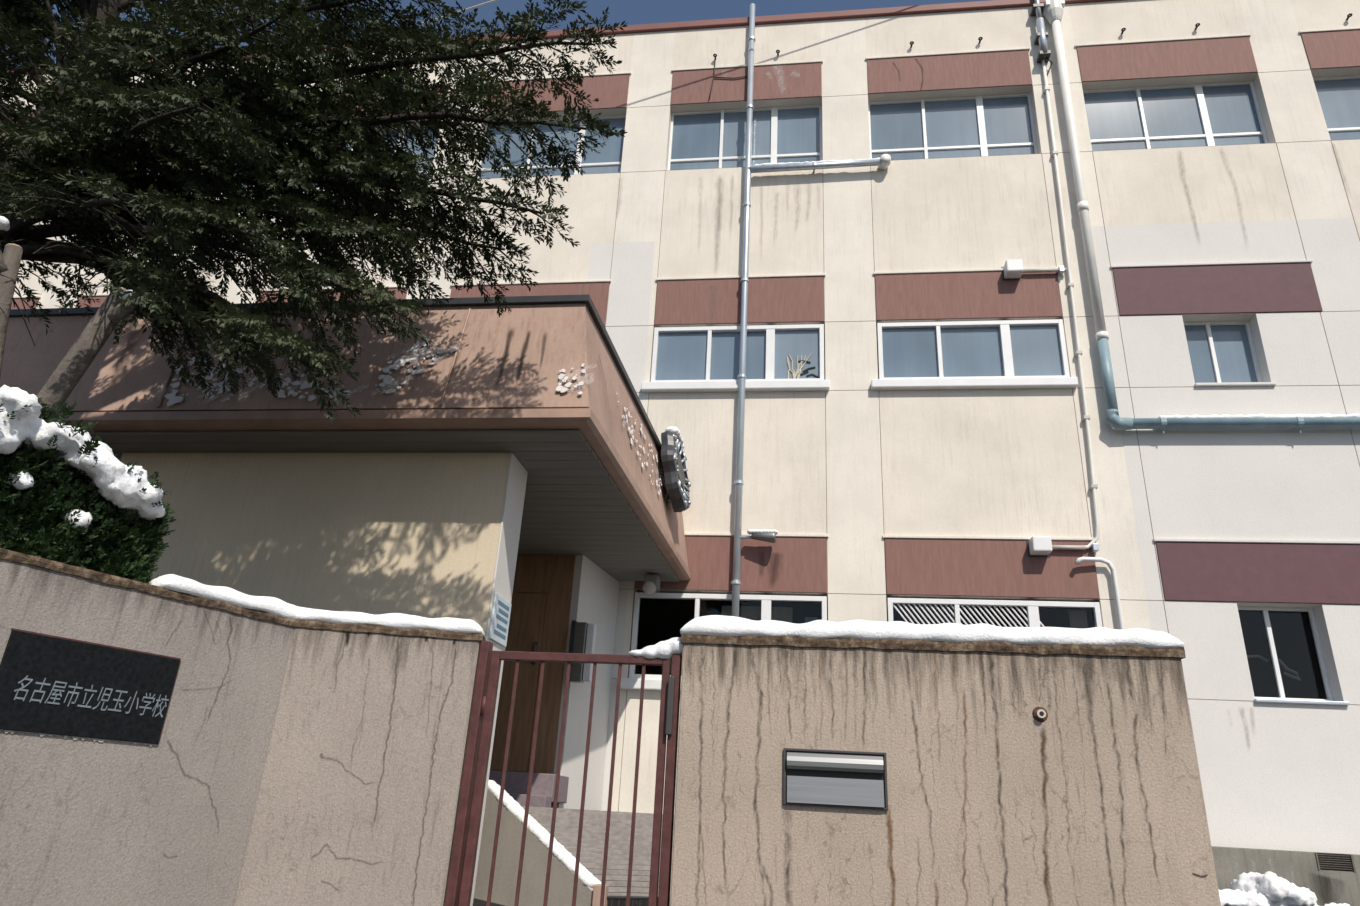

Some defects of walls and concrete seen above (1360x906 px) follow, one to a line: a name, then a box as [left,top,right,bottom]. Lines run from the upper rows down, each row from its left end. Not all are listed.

peeling [164,339,352,407]
peeling [372,336,459,394]
water stain [499,330,530,379]
peeling [555,363,586,395]
peeling [617,394,669,505]